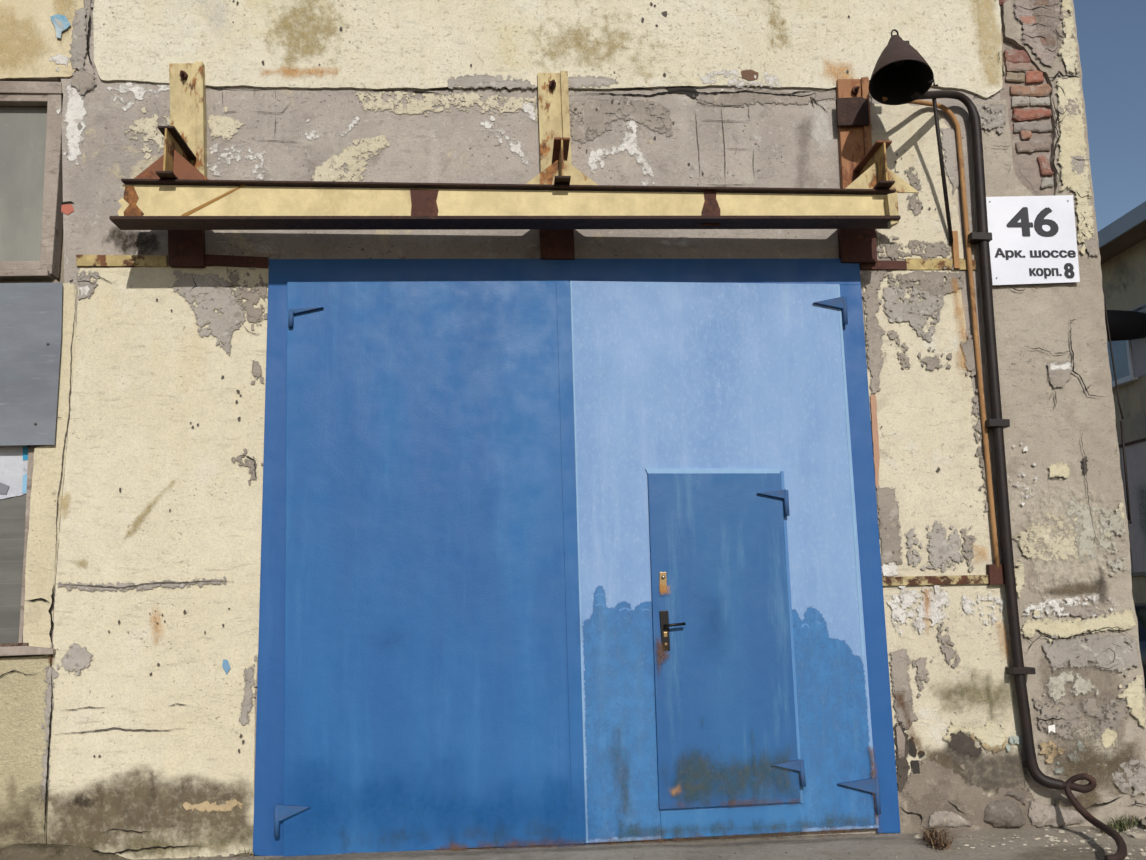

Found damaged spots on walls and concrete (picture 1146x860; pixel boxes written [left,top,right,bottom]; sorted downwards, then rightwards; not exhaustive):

peeling [312,64,539,182]
spalling [663,69,836,107]
spalling [976,0,1100,256]
peeling [173,267,268,355]
peeling [862,233,992,572]
crack [1031,319,1106,407]
crack [1051,425,1098,549]
crack [0,276,212,838]
peeling [1014,513,1082,597]
spalling [889,608,1036,833]
peeling [1021,598,1146,777]
water stain [0,771,248,849]